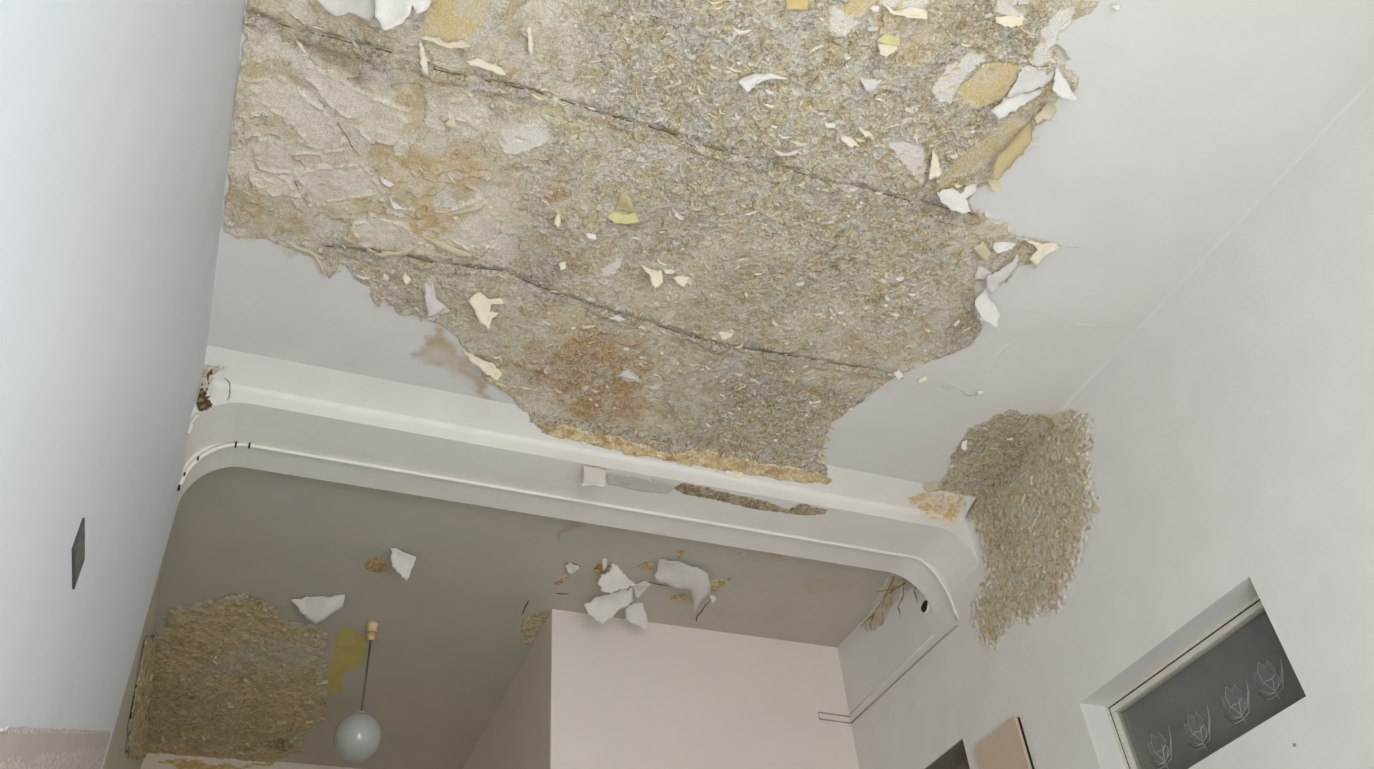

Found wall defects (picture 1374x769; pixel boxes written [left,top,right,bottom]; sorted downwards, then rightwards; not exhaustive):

crack [279,23,392,53]
crack [433,68,805,176]
crack [854,185,975,227]
crack [408,256,559,295]
peeling [222,0,1122,515]
crack [744,348,857,367]
spalling [365,548,416,581]
peeling [554,549,731,631]
peeling [904,409,1102,651]
peeling [125,593,345,769]